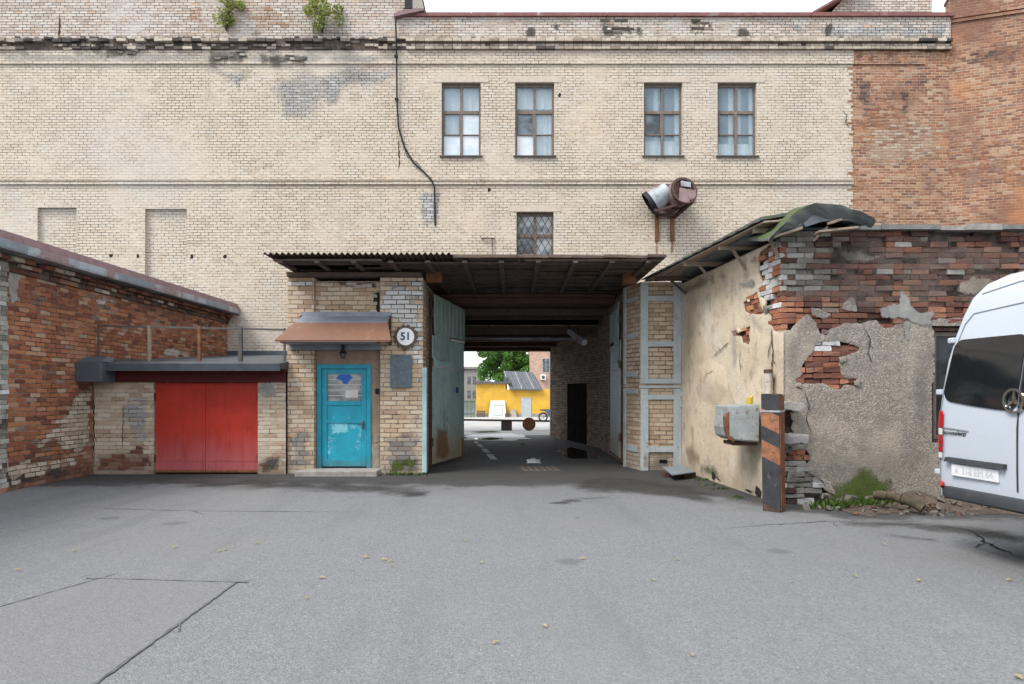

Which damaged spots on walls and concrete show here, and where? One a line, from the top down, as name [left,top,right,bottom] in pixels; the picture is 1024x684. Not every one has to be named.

spalling [599,19,637,36]
spalling [732,231,1024,389]